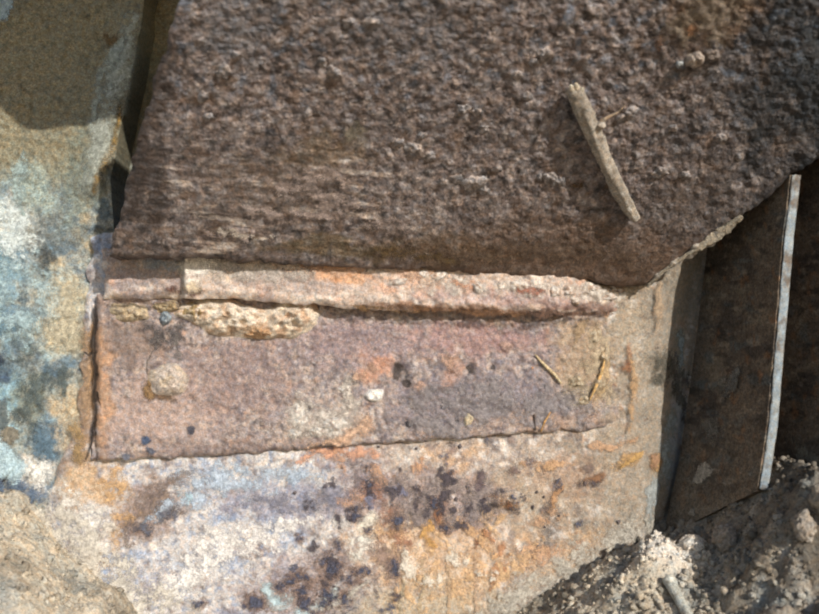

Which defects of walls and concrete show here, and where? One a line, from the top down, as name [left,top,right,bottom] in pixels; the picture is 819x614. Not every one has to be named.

crack [84,301,101,459]
corrosion [403,354,600,440]
corrosion [509,344,662,488]
water stain [398,549,444,587]
corrosion [295,412,587,614]
water stain [445,547,469,567]